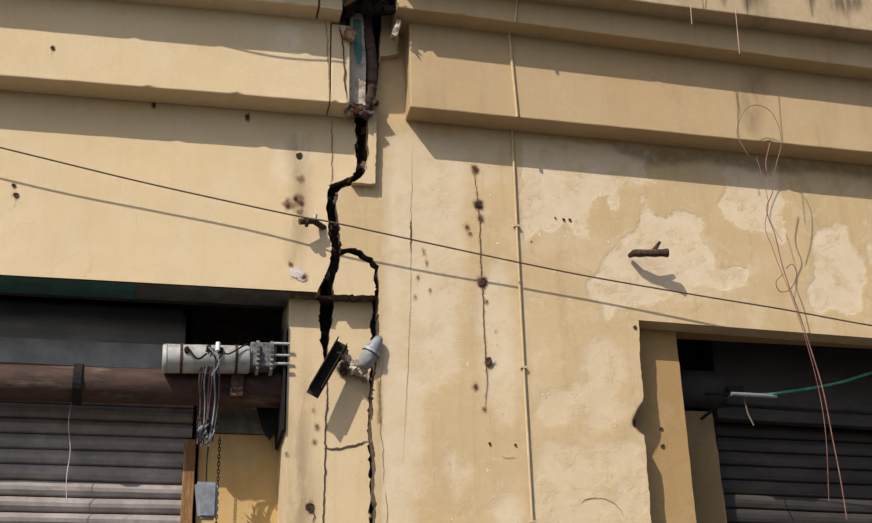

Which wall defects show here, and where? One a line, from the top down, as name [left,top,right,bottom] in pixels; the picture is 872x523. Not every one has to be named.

crack [325,21,347,100]
peeling [342,0,396,64]
rust [284,194,303,212]
crack [315,127,378,360]
crack [322,158,412,523]
rust [465,166,495,410]
peeling [378,118,872,523]